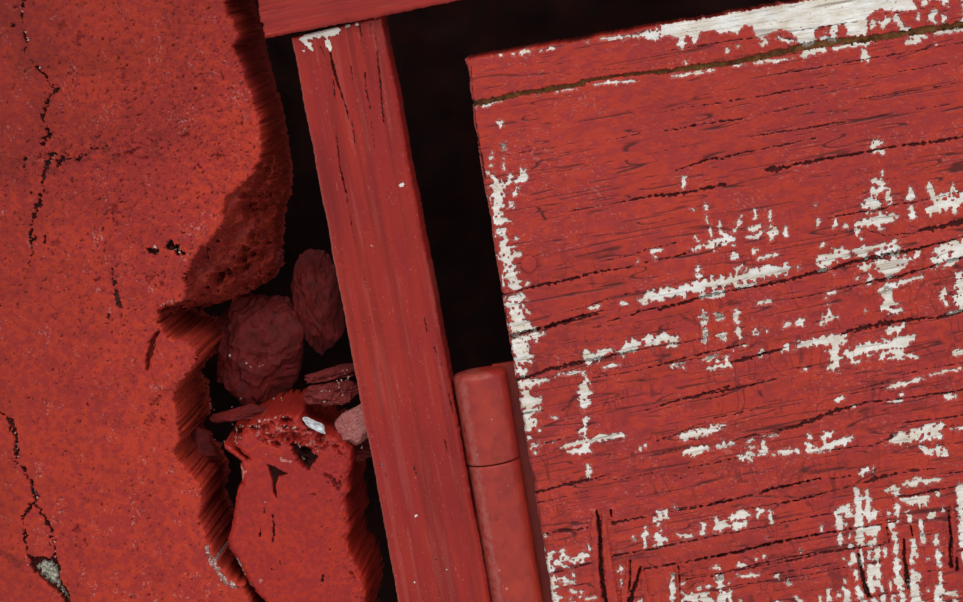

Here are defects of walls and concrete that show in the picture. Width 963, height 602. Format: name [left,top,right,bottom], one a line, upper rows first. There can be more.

peeling [600,0,963,77]
crack [10,0,108,263]
peeling [485,143,679,479]
peeling [620,202,801,371]
peeling [781,170,963,374]
crack [0,411,56,557]
peeling [543,534,597,602]
peeling [632,505,774,548]
peeling [669,555,767,602]
peeling [677,423,854,462]
peeling [819,476,963,602]
peeling [889,421,963,457]